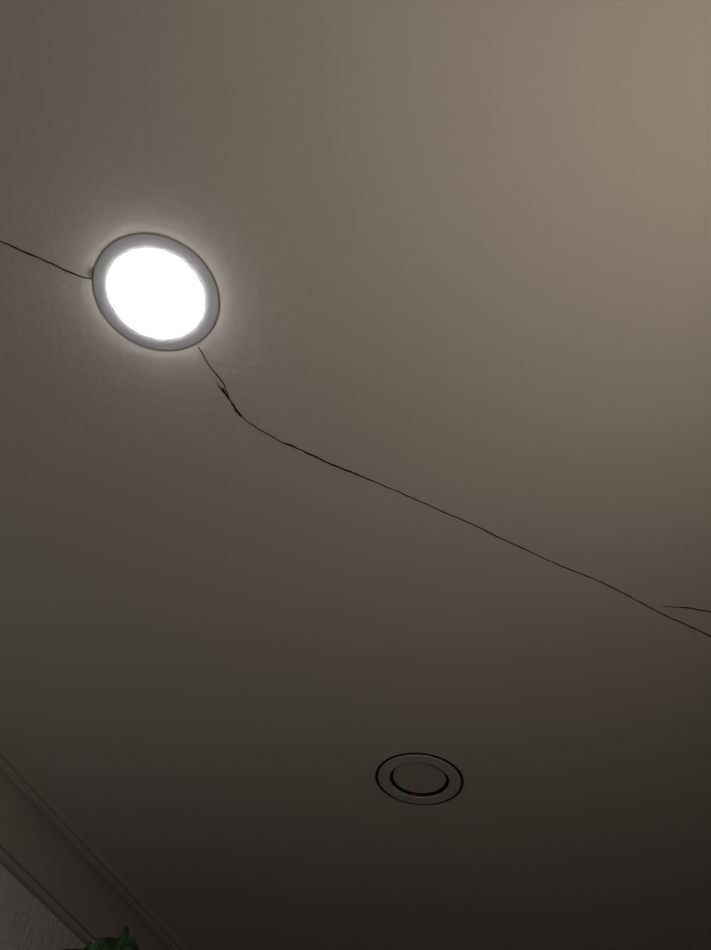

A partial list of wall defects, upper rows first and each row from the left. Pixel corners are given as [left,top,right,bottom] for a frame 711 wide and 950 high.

crack [0,241,93,279]
crack [198,347,711,637]